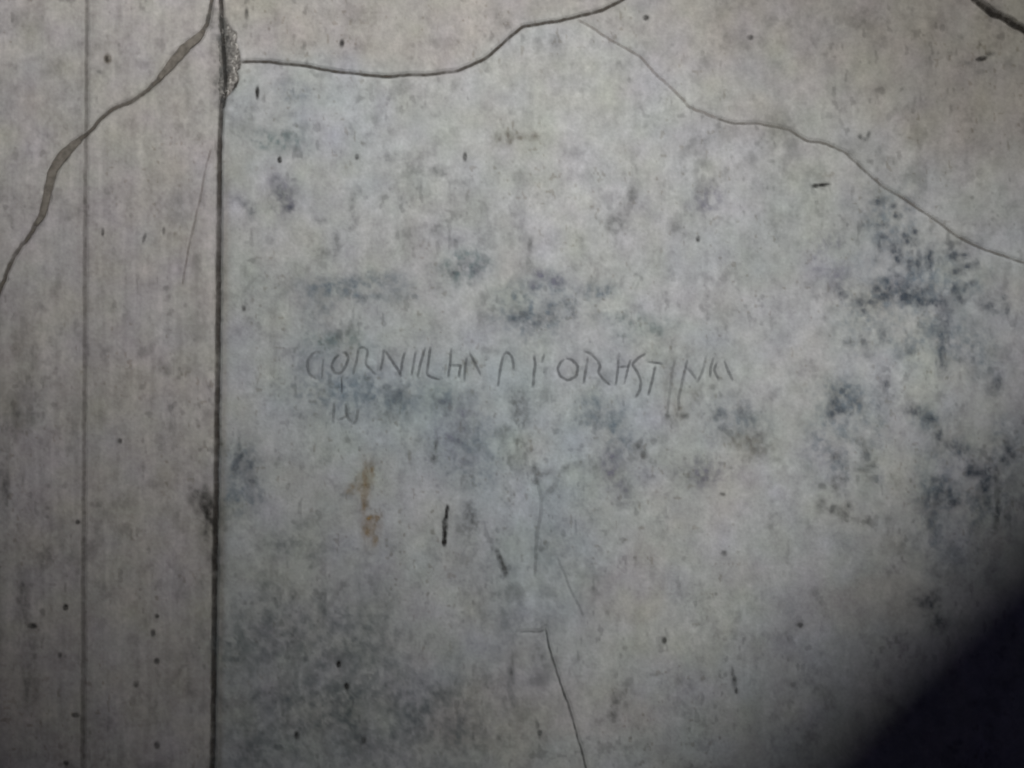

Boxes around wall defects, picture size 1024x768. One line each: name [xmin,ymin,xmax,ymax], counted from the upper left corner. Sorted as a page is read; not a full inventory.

crack [243,0,624,78]
crack [973,0,1024,33]
crack [0,0,213,293]